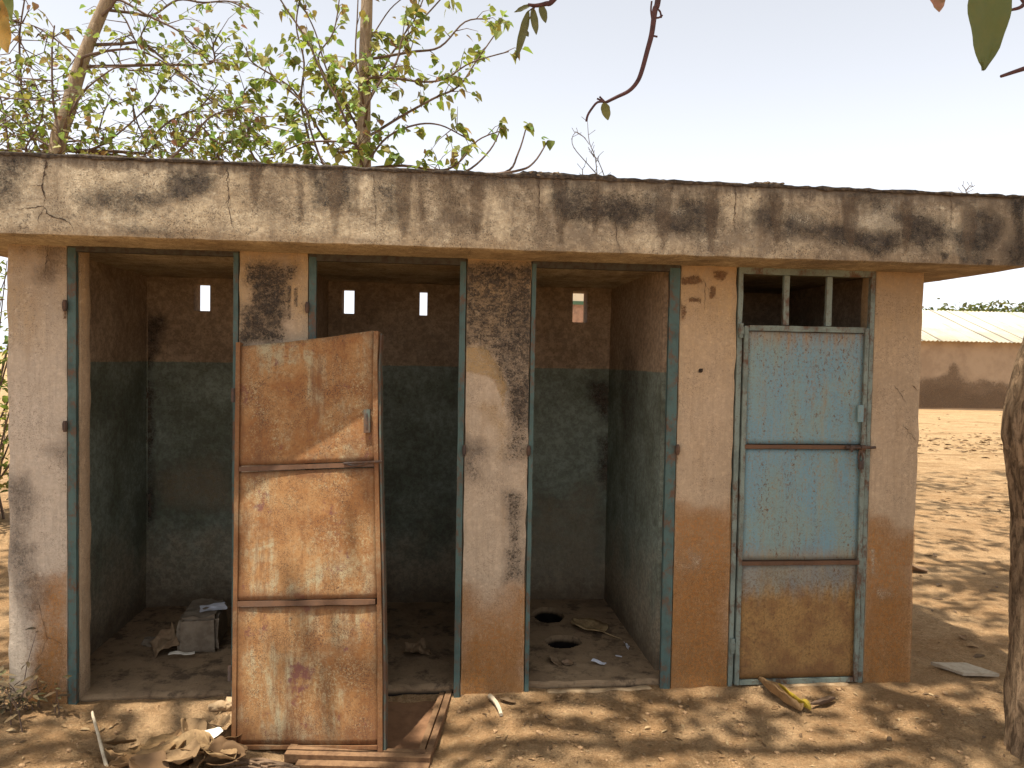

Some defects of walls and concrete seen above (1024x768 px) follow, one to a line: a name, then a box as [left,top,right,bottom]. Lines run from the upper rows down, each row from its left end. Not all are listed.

crack [18,159,74,230]
leakage [79,171,213,214]
leakage [297,170,358,234]
leakage [550,182,719,247]
leakage [753,191,1005,265]
leakage [1007,198,1024,266]
mould [238,262,298,344]
leakage [466,263,531,461]
leakage [503,493,524,579]